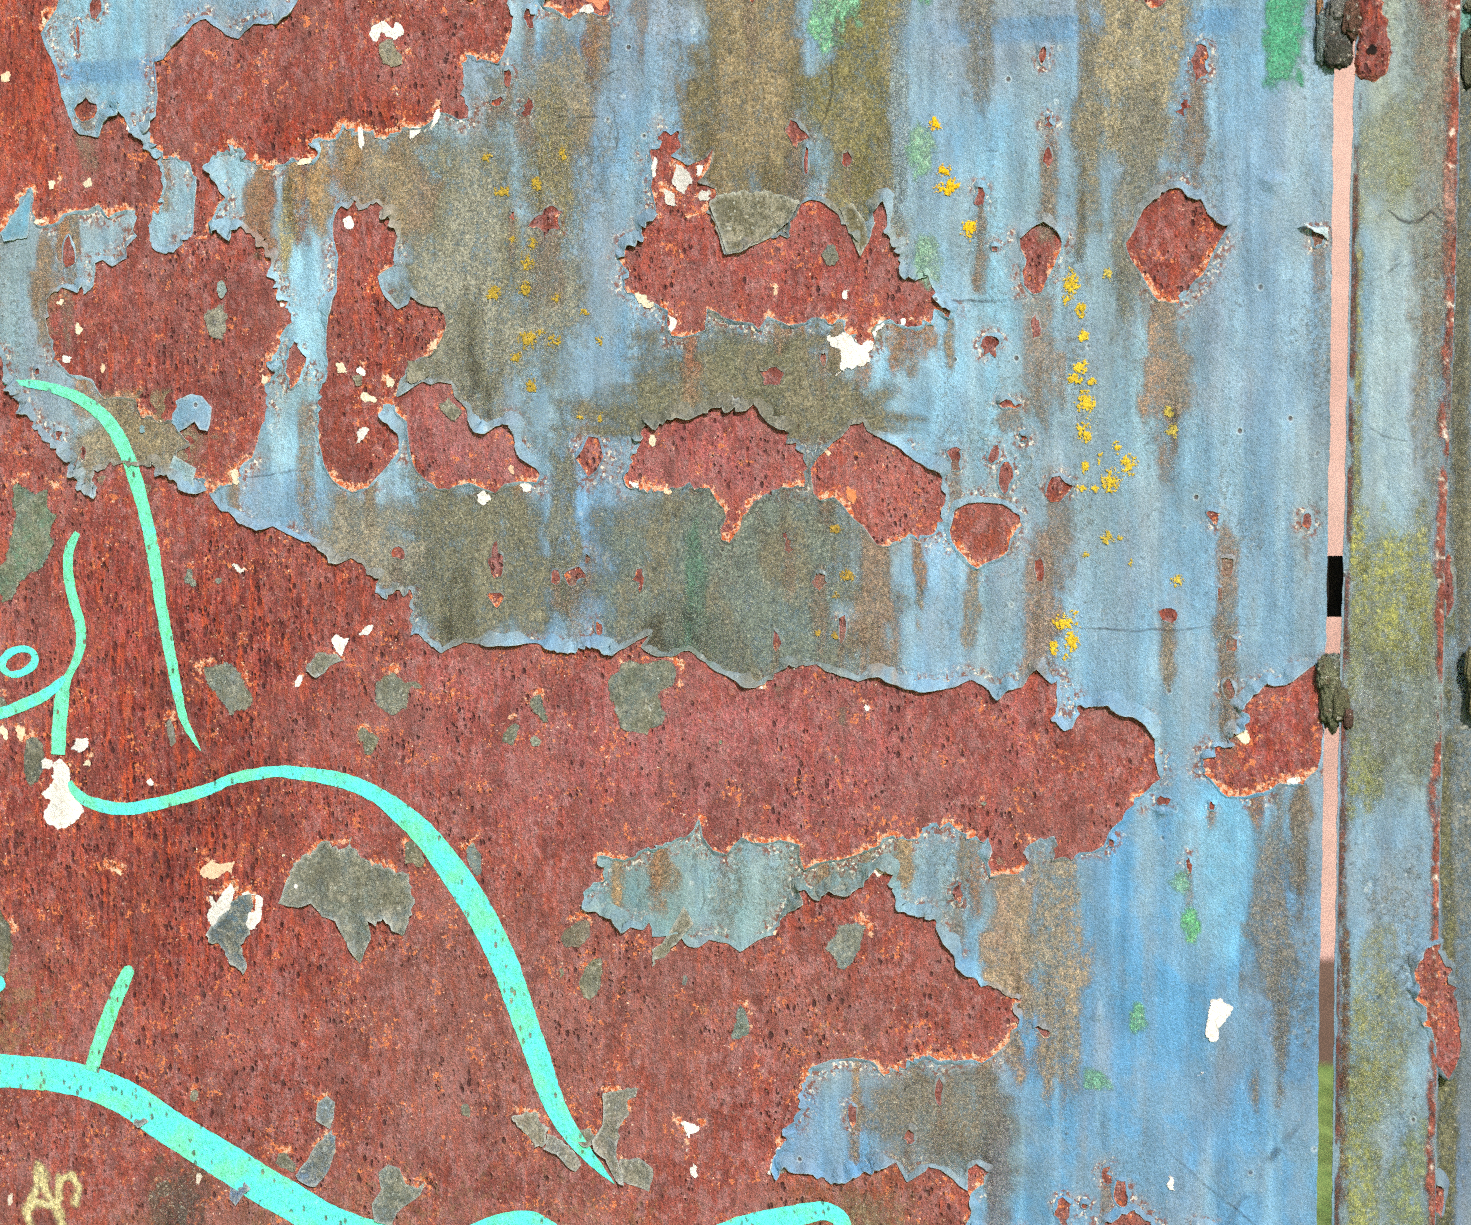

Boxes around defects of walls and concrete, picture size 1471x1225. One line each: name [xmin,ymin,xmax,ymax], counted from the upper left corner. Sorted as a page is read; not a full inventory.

peeling [71,92,100,159]
peeling [1175,40,1211,150]
corrosion [0,0,1164,1225]
peeling [979,332,1003,358]
peeling [986,394,1032,501]
peeling [1033,472,1077,588]
corrosion [1122,181,1236,422]
corrosion [1350,147,1359,377]
corrosion [1421,0,1460,682]
corrosion [1200,527,1350,1225]
corrosion [1405,702,1467,1225]
peeling [1052,1162,1131,1225]